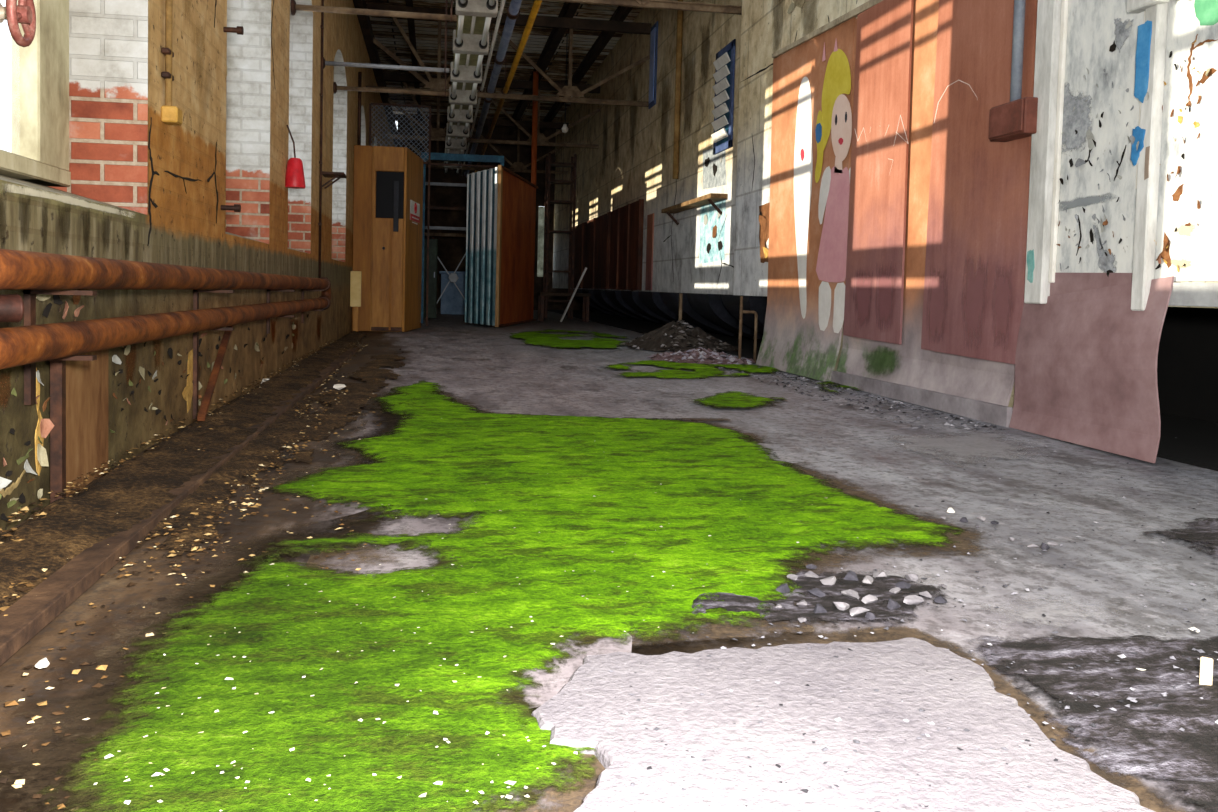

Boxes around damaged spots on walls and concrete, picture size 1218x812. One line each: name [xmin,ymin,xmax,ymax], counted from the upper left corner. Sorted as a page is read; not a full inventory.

peeling [1109,18,1133,52]
crack [147,117,218,246]
peeling [1056,68,1150,276]
peeling [1154,199,1200,273]
peeling [1162,40,1217,202]
peeling [24,368,54,475]